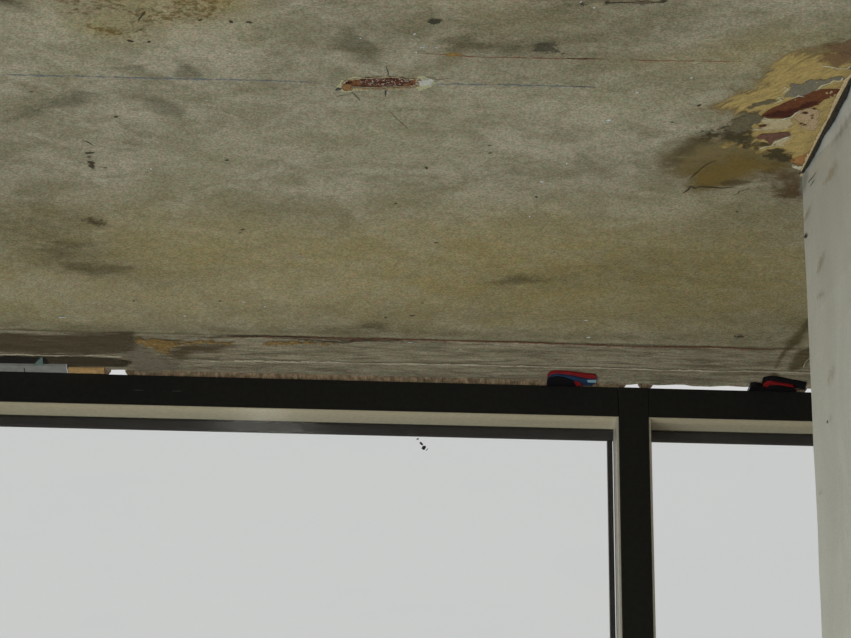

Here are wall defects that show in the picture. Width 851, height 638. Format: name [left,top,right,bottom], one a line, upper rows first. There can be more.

peeling [702,41,851,177]
water stain [666,139,802,197]
water stain [0,334,136,367]